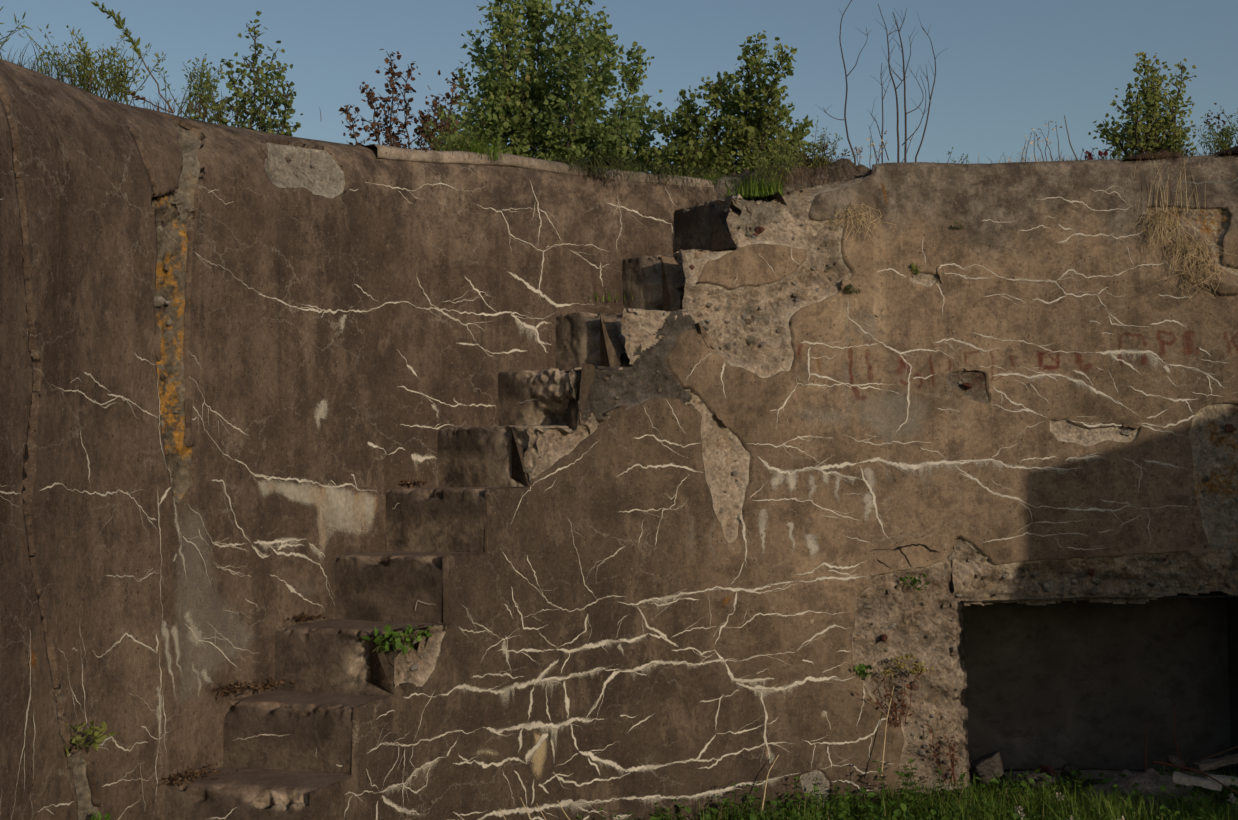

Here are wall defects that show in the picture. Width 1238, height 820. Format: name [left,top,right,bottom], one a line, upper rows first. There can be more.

crack [0,258,400,820]
spalling [260,141,345,198]
crack [195,181,677,356]
spalling [523,177,864,543]
crack [316,186,1238,820]
spalling [945,364,990,404]
spalling [852,403,1238,798]